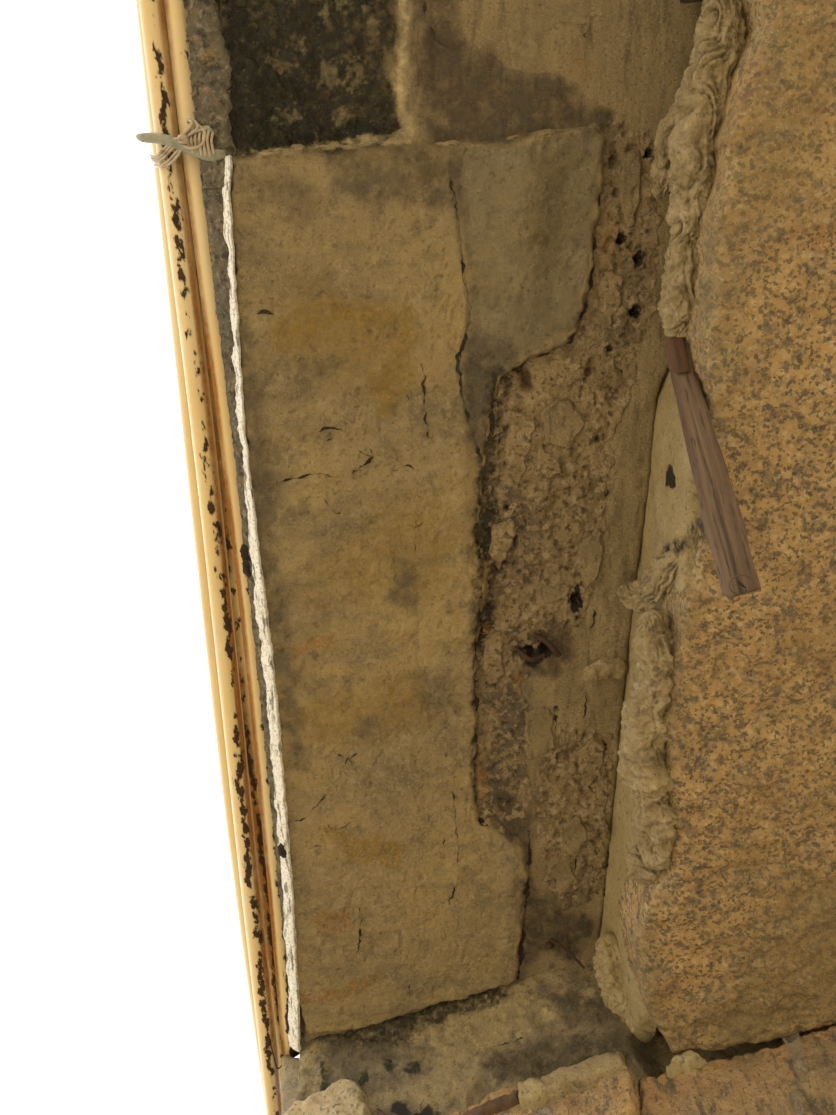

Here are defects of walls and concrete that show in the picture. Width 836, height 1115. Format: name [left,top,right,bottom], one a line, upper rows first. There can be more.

leakage [218,0,611,155]
corrosion [186,181,299,1055]
spalling [474,116,665,910]
leakage [484,998,650,1081]